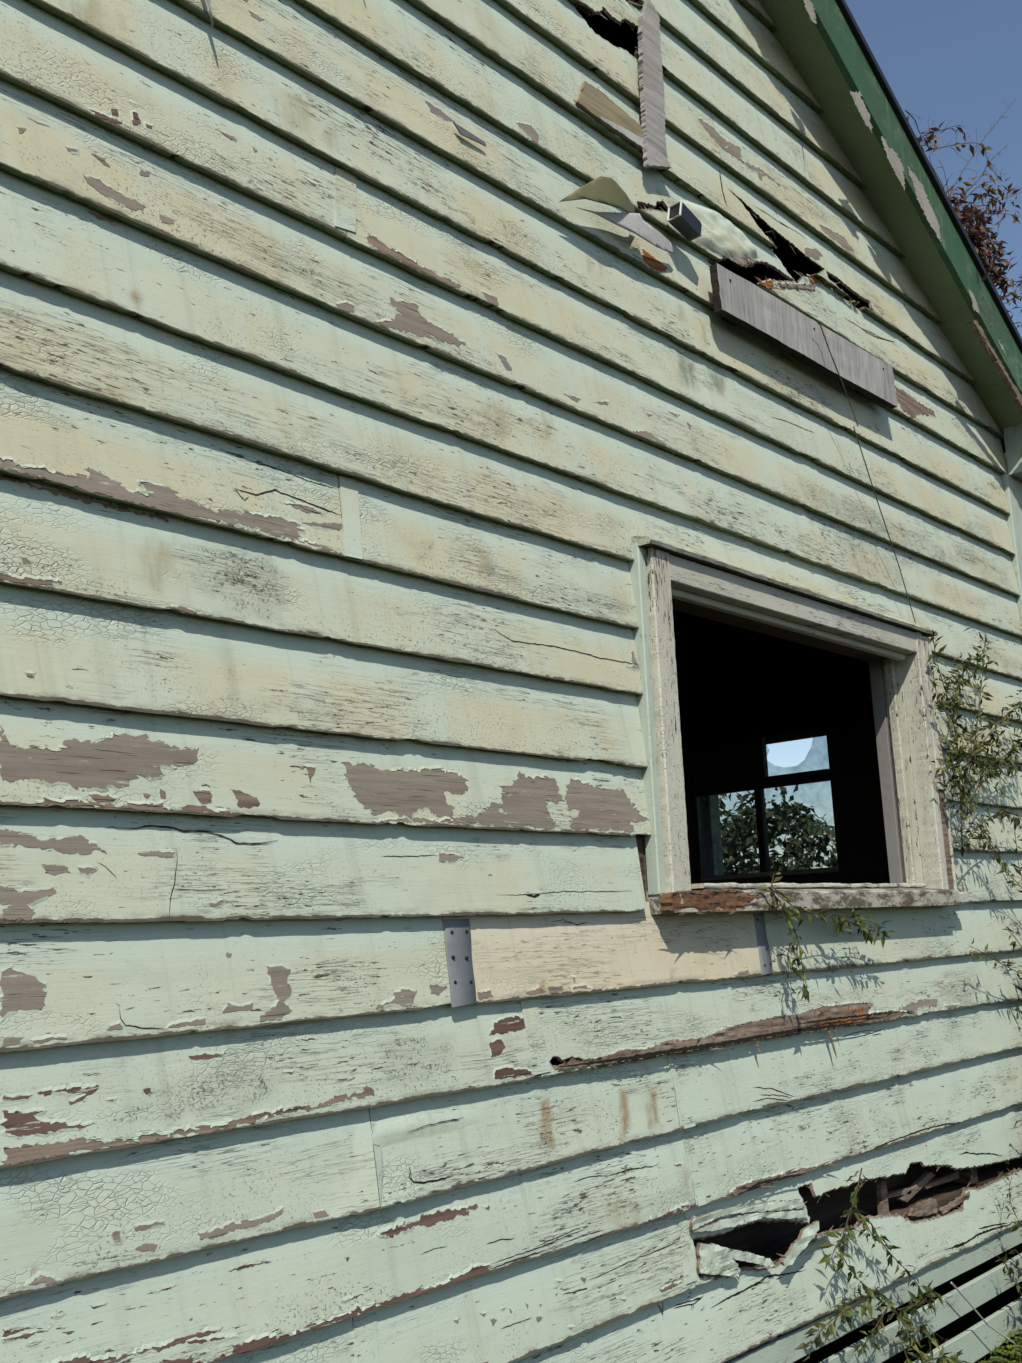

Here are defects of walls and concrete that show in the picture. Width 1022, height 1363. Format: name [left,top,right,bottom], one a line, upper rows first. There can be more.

peeling [366,232,461,289]
peeling [368,297,466,347]
peeling [0,455,343,553]
peeling [0,726,260,816]
peeling [341,762,650,833]
peeling [0,964,67,1047]
peeling [221,963,293,1022]
peeling [376,984,447,1009]
peeling [489,1013,534,1082]
peeling [0,1075,375,1166]
peeling [0,1311,74,1348]
peeling [46,1262,492,1363]